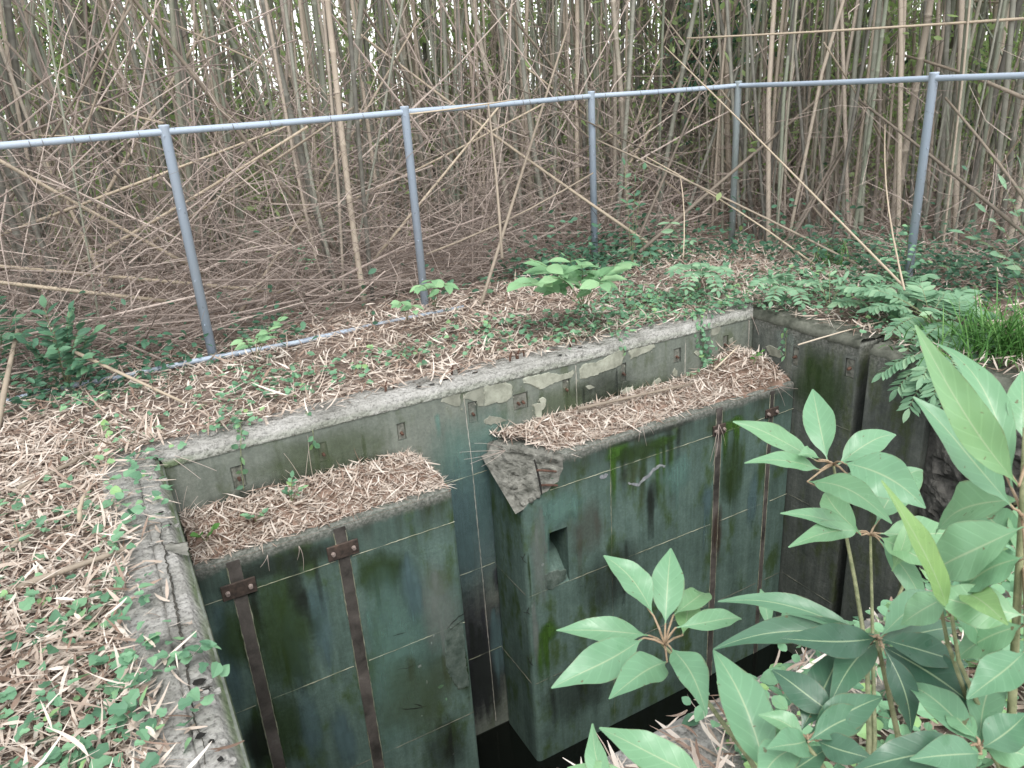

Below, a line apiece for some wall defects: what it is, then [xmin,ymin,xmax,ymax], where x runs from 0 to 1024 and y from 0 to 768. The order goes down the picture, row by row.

spalling [970,358,1020,394]
spalling [1003,430,1022,511]
spalling [100,298,969,768]